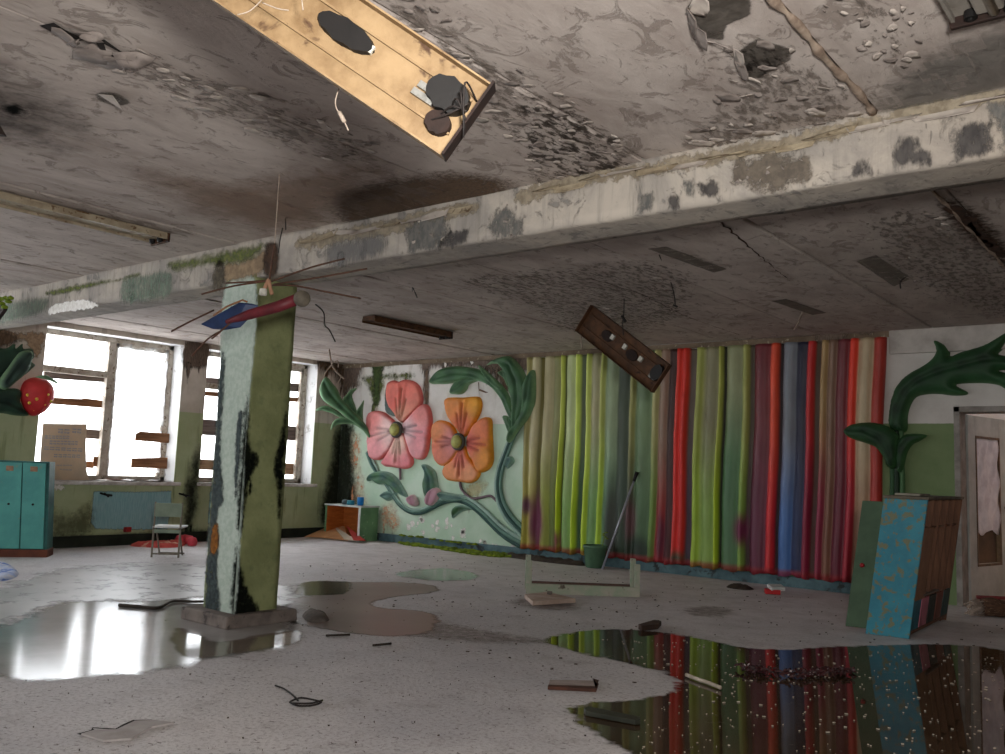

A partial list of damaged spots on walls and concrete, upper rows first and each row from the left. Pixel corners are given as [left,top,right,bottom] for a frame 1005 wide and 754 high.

peeling [97,93,130,111]
flaking render [391,0,1005,240]
damp [170,172,514,227]
peeling [294,202,479,254]
damp [211,243,278,312]
peeling [458,260,697,333]
damp [316,361,364,400]
damp [183,318,259,614]
damp [273,414,287,517]
damp [320,424,357,523]